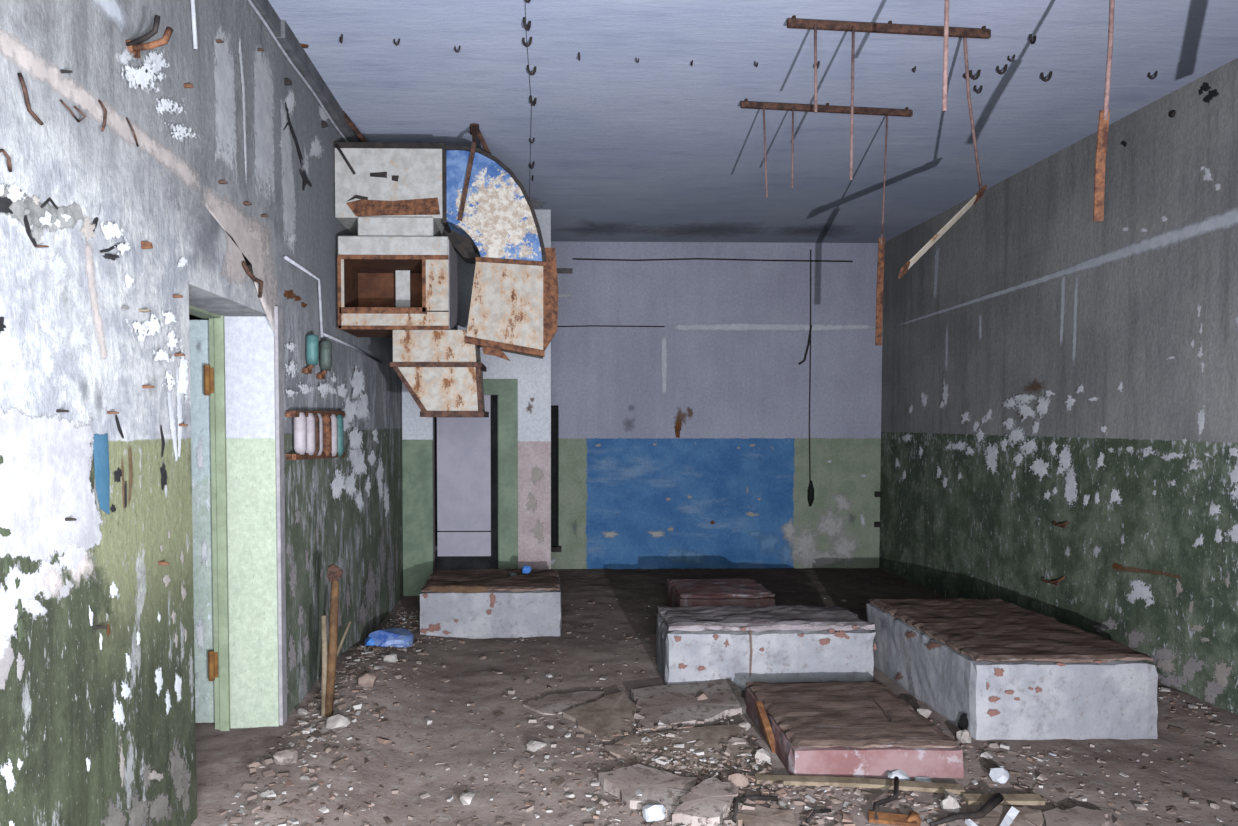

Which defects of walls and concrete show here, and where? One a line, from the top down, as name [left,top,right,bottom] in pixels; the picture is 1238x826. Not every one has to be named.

peeling [116,49,200,142]
spalling [0,184,130,359]
peeling [0,407,110,690]
peeling [121,305,189,461]
peeling [284,343,399,697]
corrosion [675,408,693,438]
peeling [946,385,1122,509]
peeling [1096,405,1212,486]
peeling [1192,447,1238,548]
peeling [1093,578,1234,705]
peeling [0,758,23,794]
peeling [100,631,191,826]